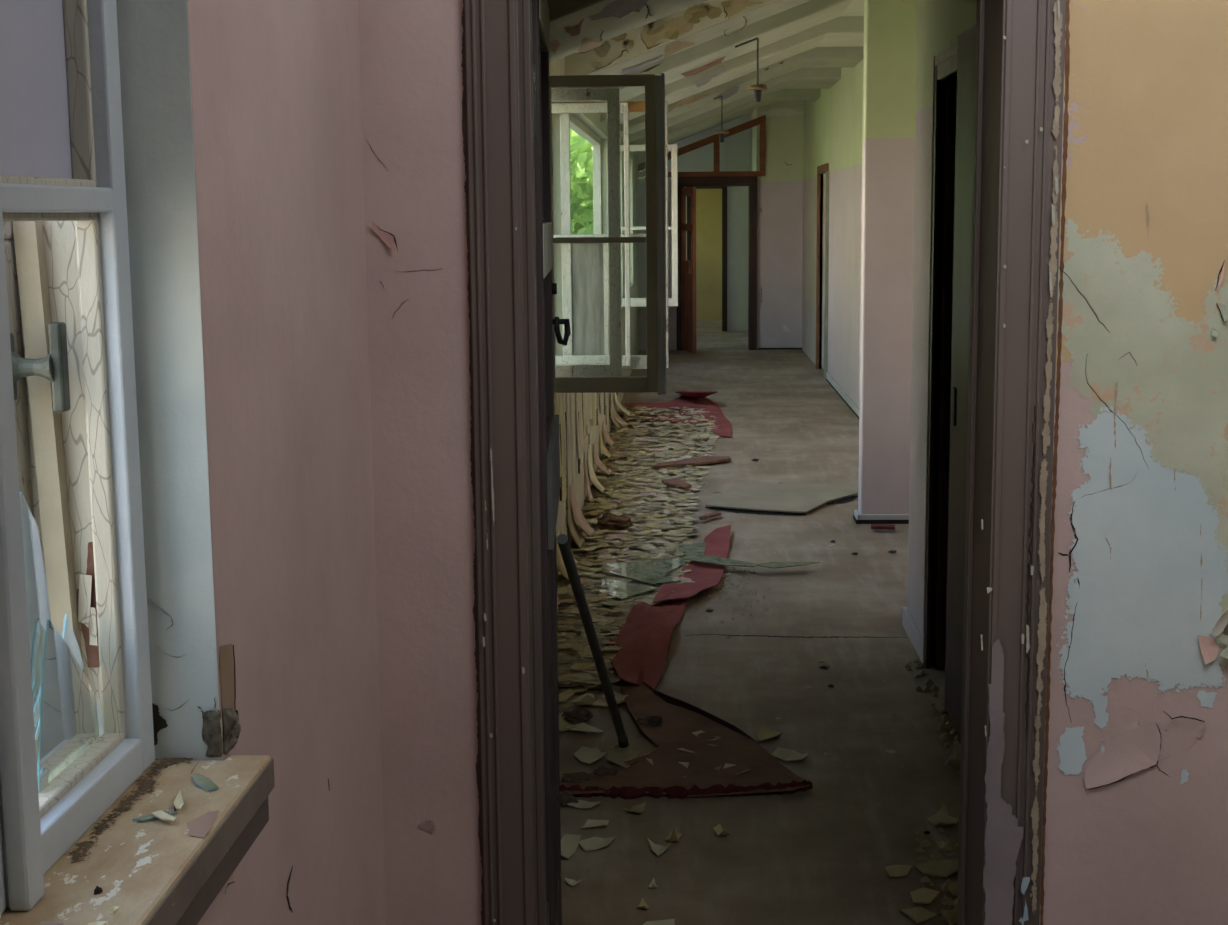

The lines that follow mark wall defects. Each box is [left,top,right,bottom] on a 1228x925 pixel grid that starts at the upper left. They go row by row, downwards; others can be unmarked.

peeling [539,0,764,74]
spalling [673,56,740,108]
crack [1059,268,1107,329]
peeling [981,0,1228,925]
crack [1025,354,1146,730]
spalling [197,699,241,758]
peeling [151,790,219,837]